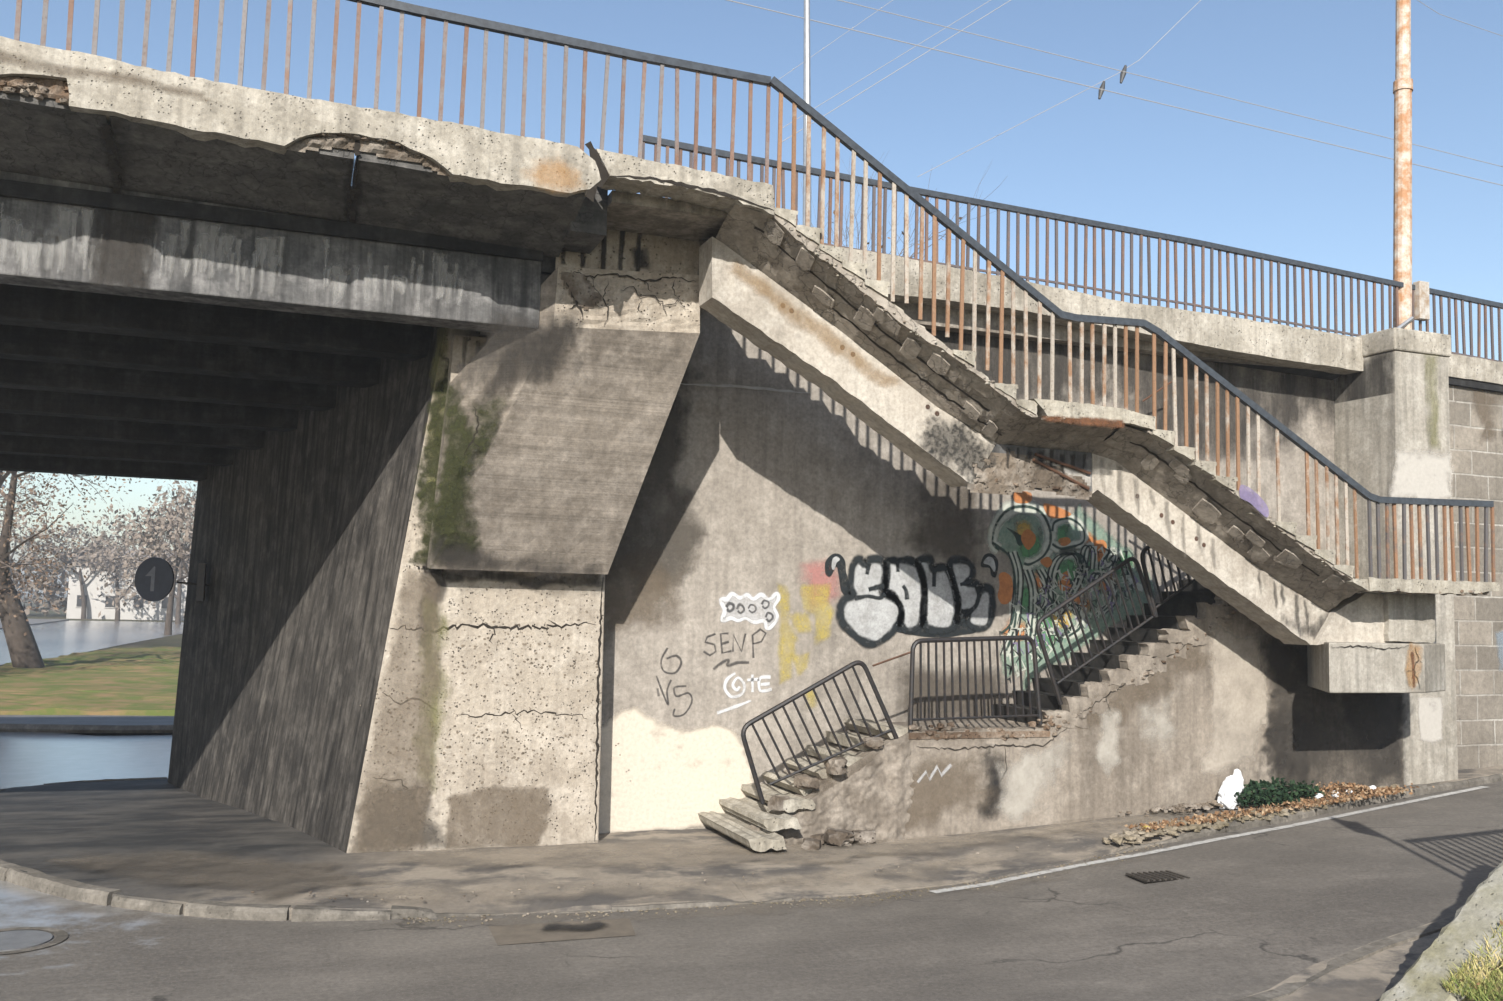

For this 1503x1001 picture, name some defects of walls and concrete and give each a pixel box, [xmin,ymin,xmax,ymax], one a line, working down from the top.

spalling [0,76,69,106]
spalling [286,133,450,176]
crack [559,271,696,327]
crack [585,141,1002,436]
spalling [601,169,995,385]
leakage [459,315,575,389]
spalling [962,401,1092,500]
leakage [358,373,705,853]
crack [384,581,603,842]
spalling [773,609,1268,848]
corrosion [1407,645,1419,687]